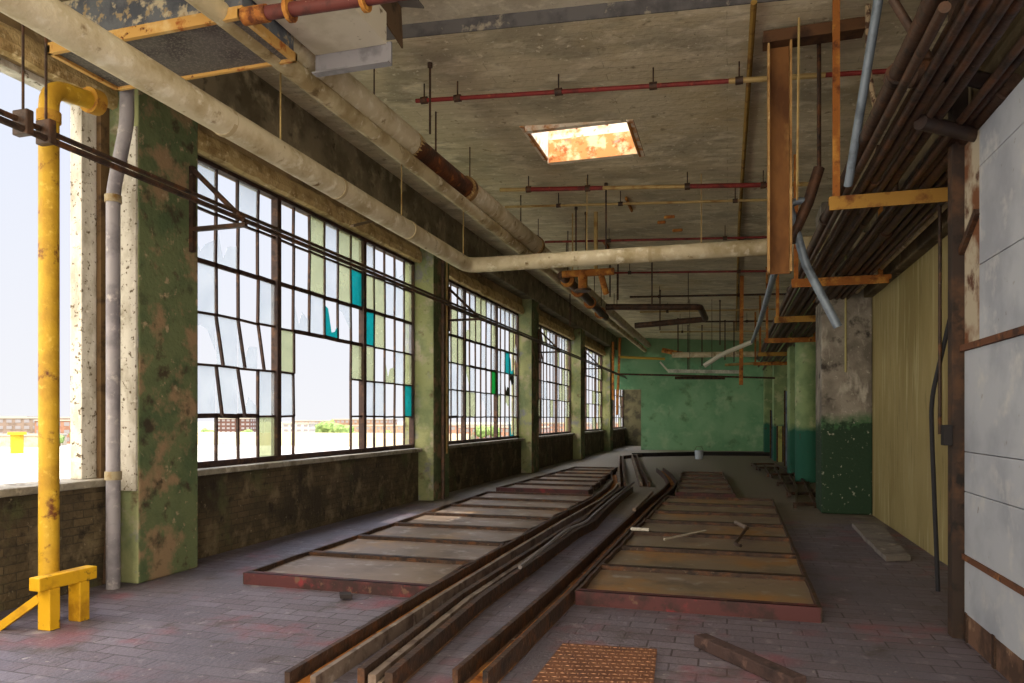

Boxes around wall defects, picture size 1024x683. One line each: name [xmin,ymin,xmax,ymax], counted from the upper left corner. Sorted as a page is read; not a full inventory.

corrosion [965,130,981,344]